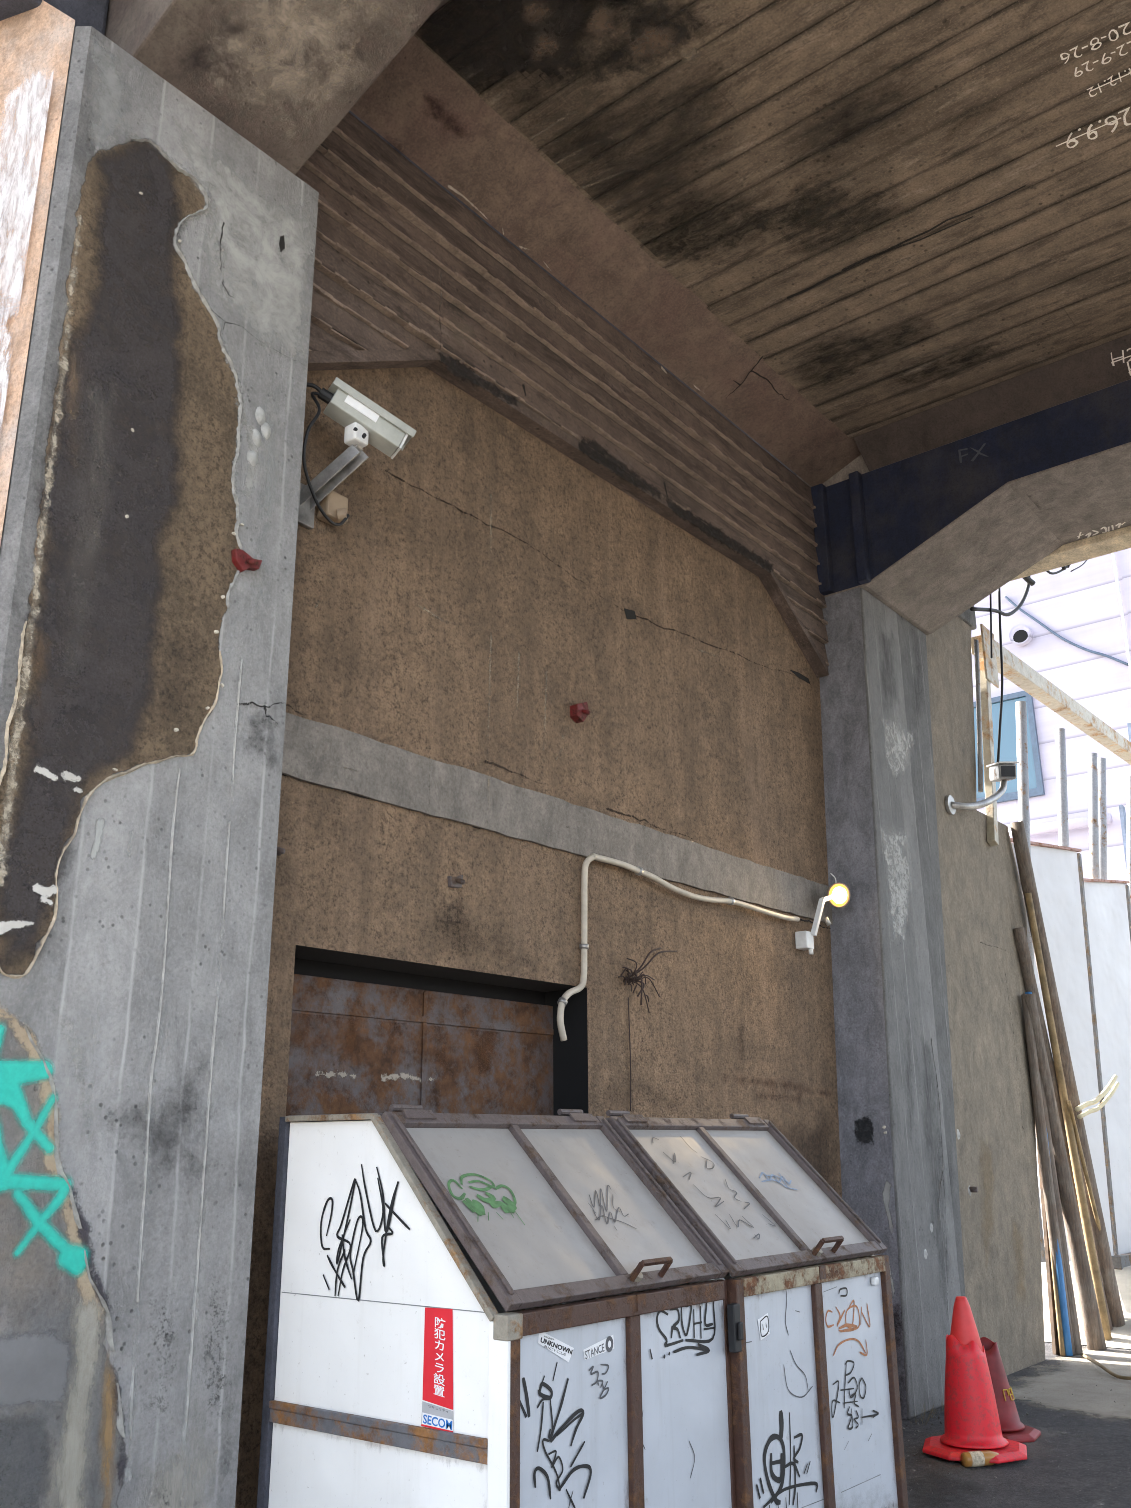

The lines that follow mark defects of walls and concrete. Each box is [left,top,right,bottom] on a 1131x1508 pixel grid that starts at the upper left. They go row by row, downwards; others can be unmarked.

peeling [0,72,53,427]
water stain [415,0,710,242]
water stain [822,84,903,160]
spalling [0,136,259,979]
crack [385,470,811,685]
spalling [0,1007,127,1508]